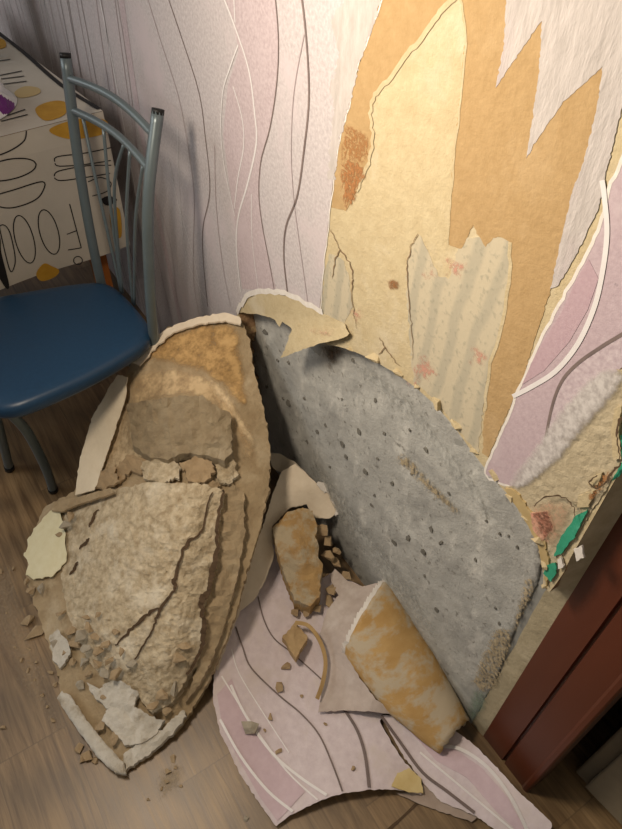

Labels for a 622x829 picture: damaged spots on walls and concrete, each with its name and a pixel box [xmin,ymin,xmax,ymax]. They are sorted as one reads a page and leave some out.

corrosion [341,127,368,207]
spalling [236,288,622,723]